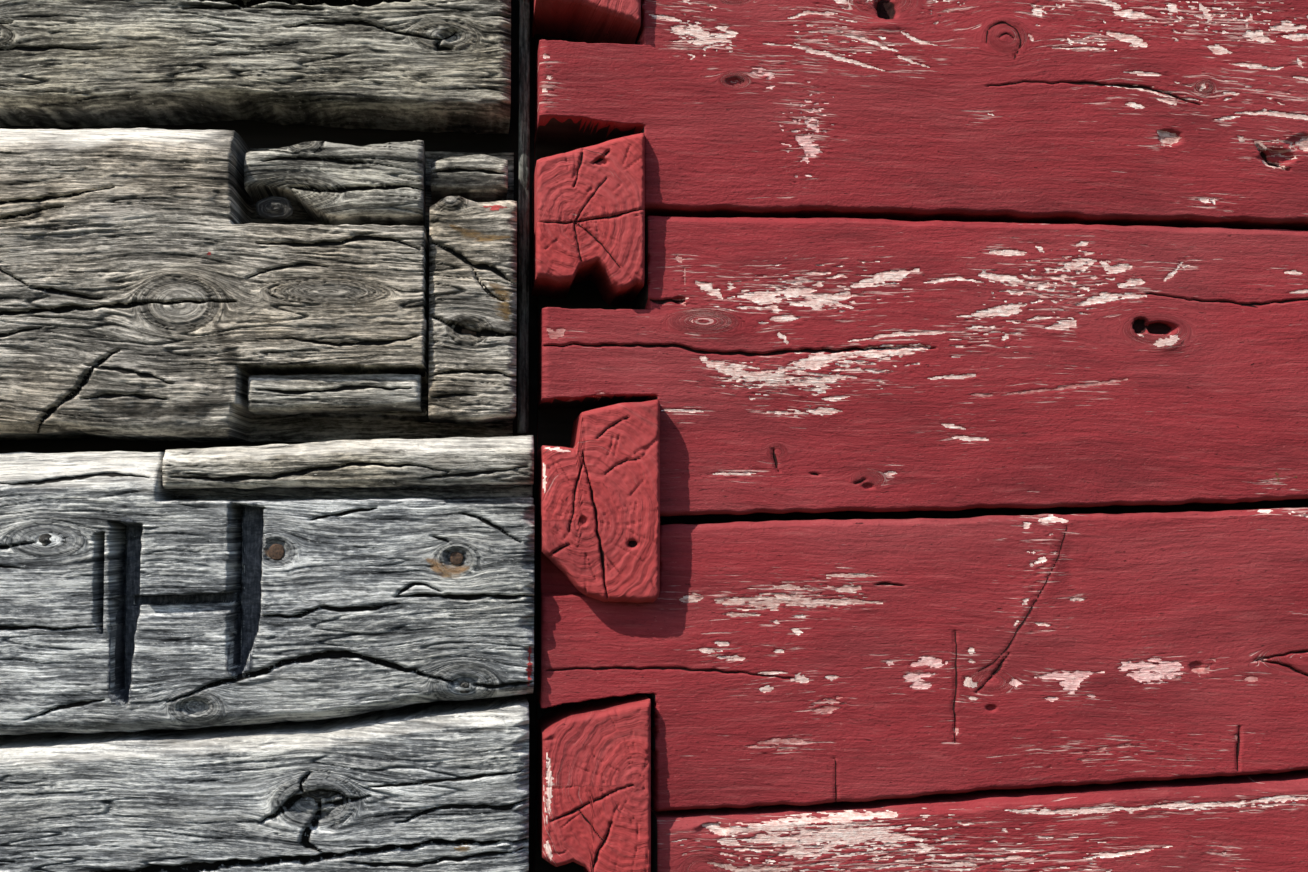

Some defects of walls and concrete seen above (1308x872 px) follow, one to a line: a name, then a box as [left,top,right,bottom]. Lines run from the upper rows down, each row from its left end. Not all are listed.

crack [553,417,640,594]